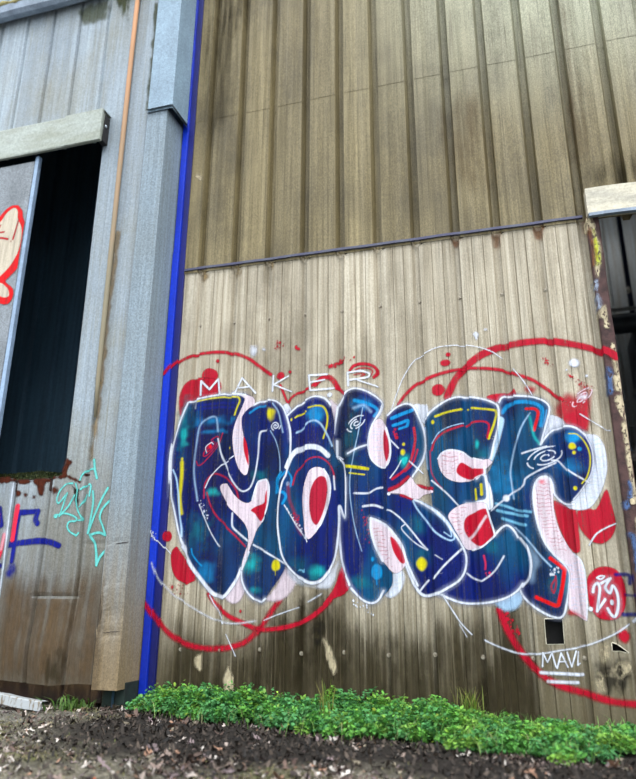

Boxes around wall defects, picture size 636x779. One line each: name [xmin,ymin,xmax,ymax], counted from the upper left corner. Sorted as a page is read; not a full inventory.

corrosion [0,459,90,498]